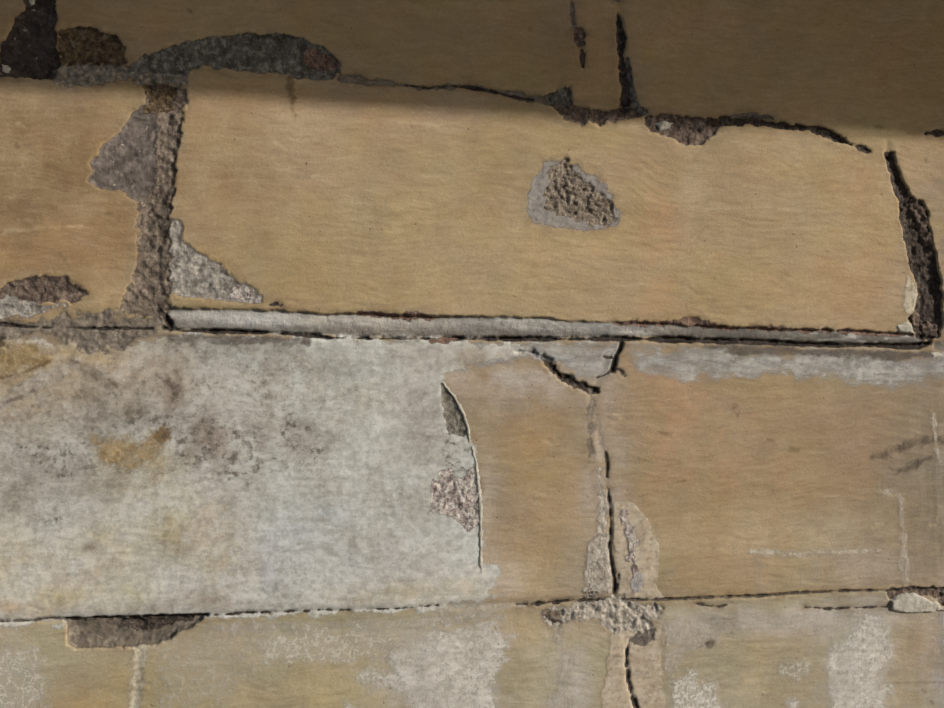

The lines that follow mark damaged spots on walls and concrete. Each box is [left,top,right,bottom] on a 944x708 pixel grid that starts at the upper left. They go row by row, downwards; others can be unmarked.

spalling [52,26,341,89]
crack [337,74,550,106]
crack [570,1,586,68]
spalling [527,158,622,232]
crack [705,112,944,341]
spalling [0,275,88,319]
spalling [613,317,914,337]
peeling [430,382,483,573]
crack [516,339,888,611]
water stain [0,331,619,708]
crack [601,628,666,708]
water stain [661,611,895,708]